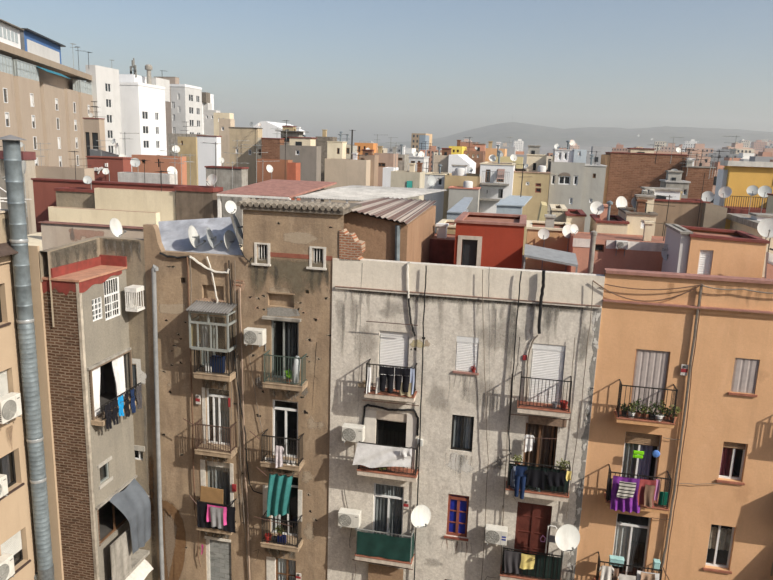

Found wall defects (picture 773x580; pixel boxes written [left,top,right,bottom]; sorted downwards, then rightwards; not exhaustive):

leakage [250,258,329,298]
peeling [574,308,602,531]